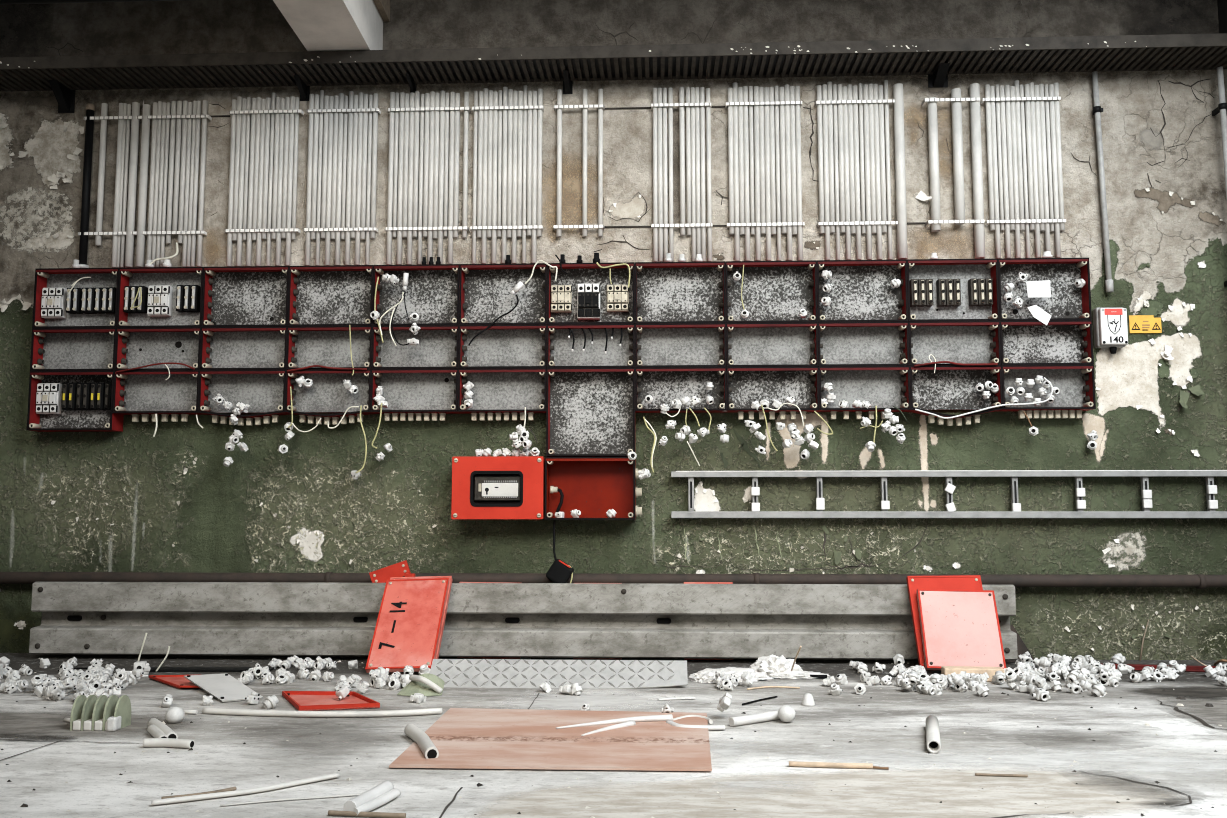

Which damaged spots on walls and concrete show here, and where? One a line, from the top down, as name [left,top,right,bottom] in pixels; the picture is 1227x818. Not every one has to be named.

crack [1147,79,1214,187]
peeling [0,113,84,254]
peeling [0,294,33,312]
peeling [1095,290,1204,436]
peeling [290,528,324,562]
peeling [1102,531,1146,571]
crack [1158,700,1227,730]
crack [1082,771,1192,807]